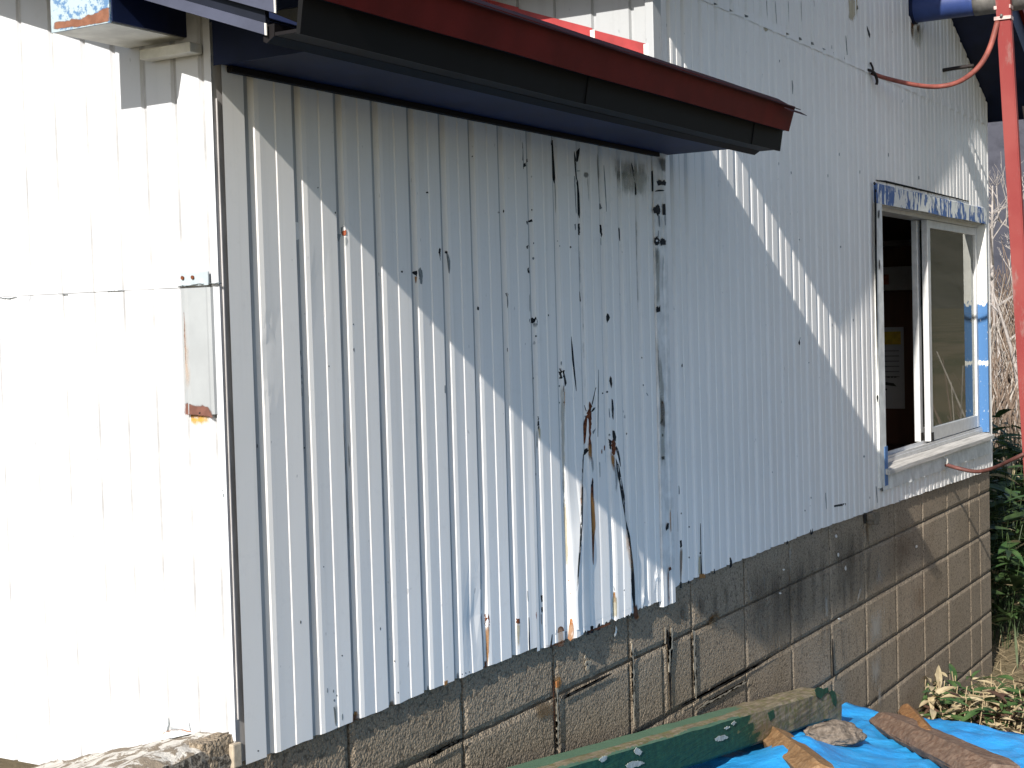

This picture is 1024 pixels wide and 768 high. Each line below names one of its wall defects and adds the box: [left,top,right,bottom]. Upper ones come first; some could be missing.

rust [185,403,212,423]
rust [588,587,625,633]
rust [552,618,574,647]